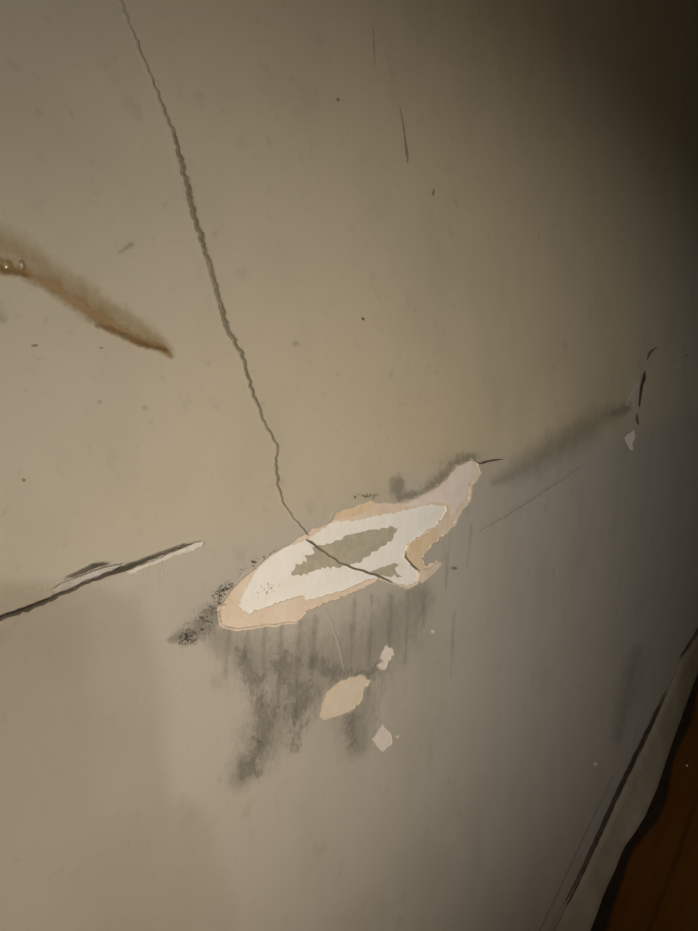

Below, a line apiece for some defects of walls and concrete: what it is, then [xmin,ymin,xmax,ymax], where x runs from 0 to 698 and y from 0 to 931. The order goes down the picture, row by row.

crack [118,0,309,536]
rust [0,260,172,357]
flaking render [624,430,635,450]
crack [0,541,203,621]
damp [179,569,241,645]
peeling [217,458,482,631]
peeling [377,646,394,670]
peeling [319,675,369,720]
peeling [372,725,399,752]